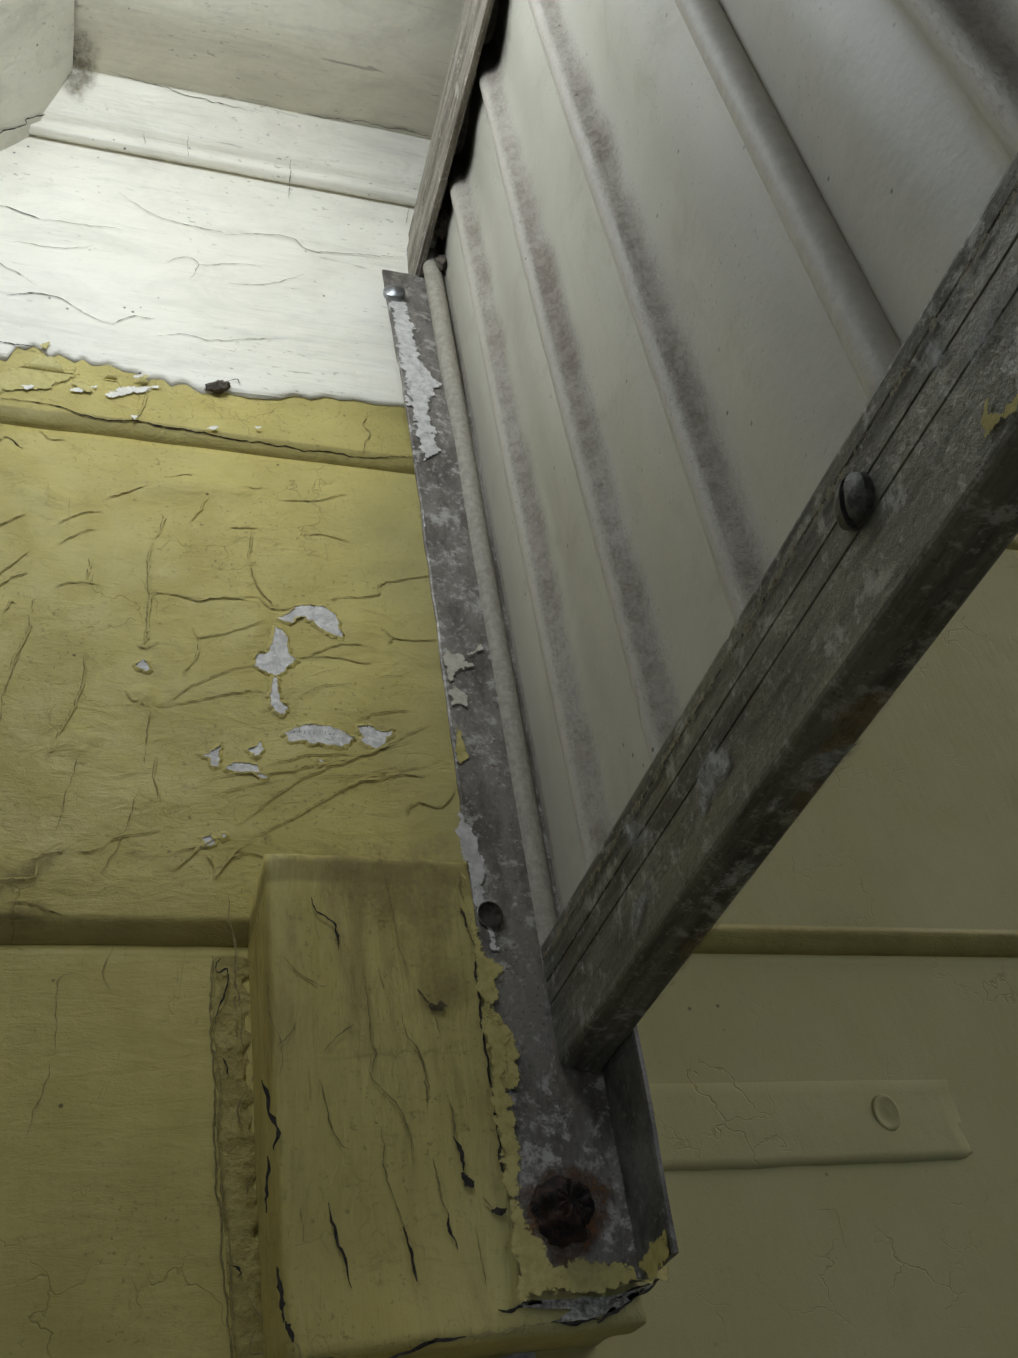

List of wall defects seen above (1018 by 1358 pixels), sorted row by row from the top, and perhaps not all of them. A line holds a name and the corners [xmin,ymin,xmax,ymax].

peeling [0,342,159,398]
crack [0,392,412,459]
peeling [251,603,396,769]
peeling [194,739,270,783]
crack [0,473,457,1213]
crack [318,853,514,1289]
crack [300,1203,352,1288]
rust [524,1167,609,1263]
crack [276,1266,334,1358]
crack [389,1321,581,1358]